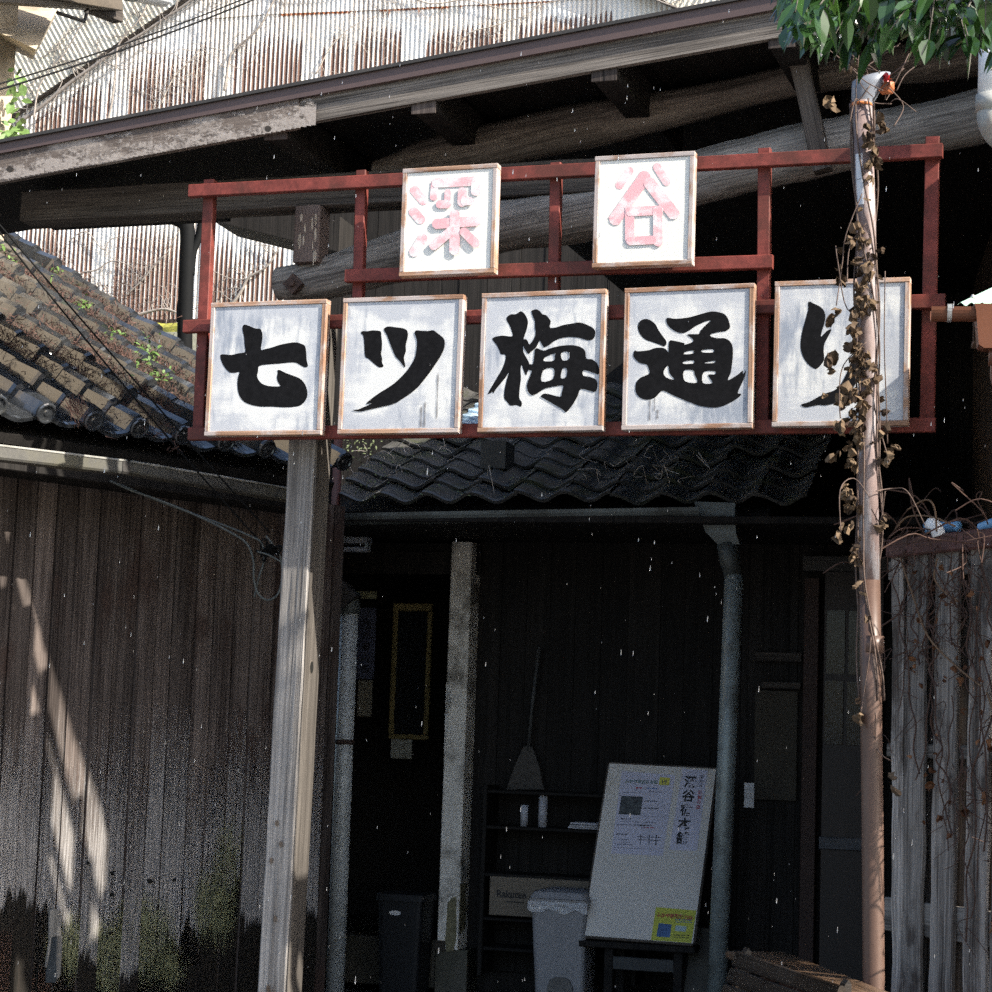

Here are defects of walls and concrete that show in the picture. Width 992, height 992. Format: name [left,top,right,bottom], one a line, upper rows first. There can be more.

rust [35,79,111,132]
rust [128,44,206,114]
rust [233,33,302,94]
rust [25,228,93,283]
rust [113,226,180,320]
rust [213,239,283,303]
water stain [0,740,269,992]